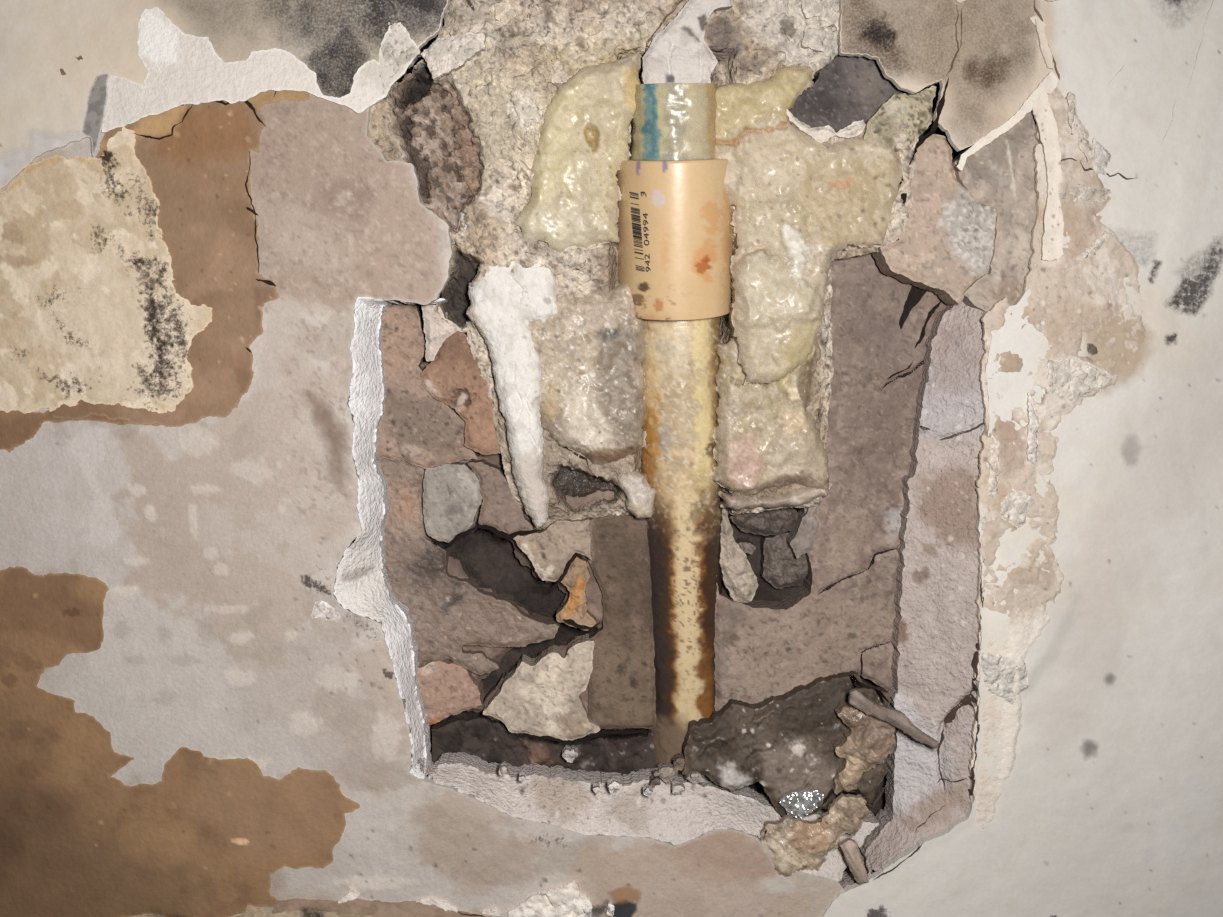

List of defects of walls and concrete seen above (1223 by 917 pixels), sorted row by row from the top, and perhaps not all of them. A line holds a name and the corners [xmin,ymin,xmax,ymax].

mould [267,0,447,98]
mould [845,0,909,70]
mould [964,54,1010,88]
mould [100,151,158,237]
mould [133,258,187,398]
spalling [806,122,919,449]
leakage [316,406,342,472]
peeling [0,0,844,917]
spalling [952,16,1147,834]
leakage [303,576,331,595]